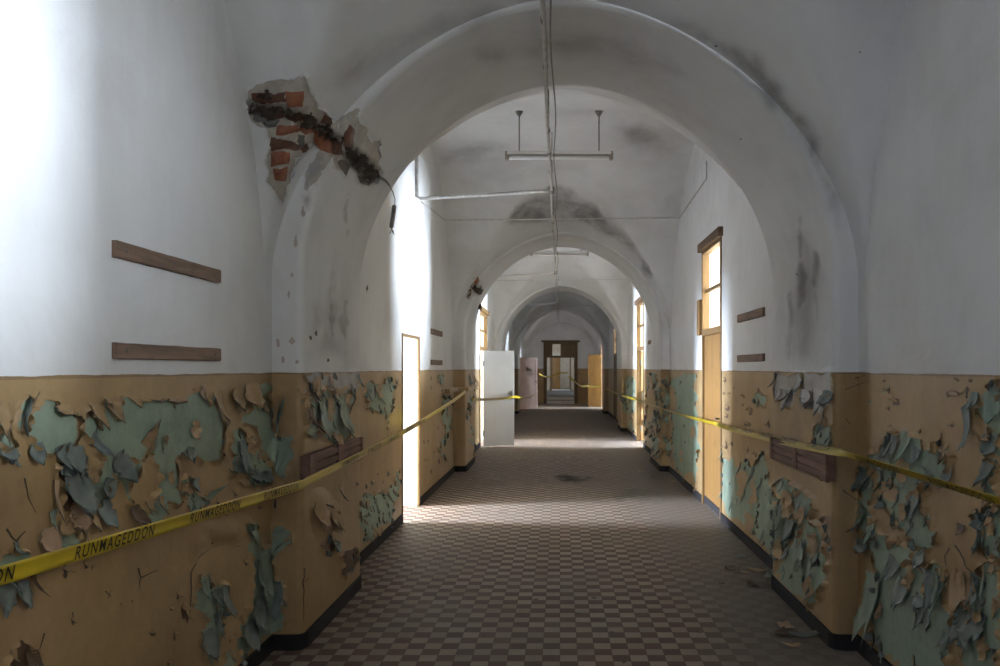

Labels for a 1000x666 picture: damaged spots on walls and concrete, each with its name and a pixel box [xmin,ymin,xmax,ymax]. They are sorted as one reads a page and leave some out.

spalling [242,71,383,210]
spalling [464,273,485,302]
peeling [0,575,49,619]
peeling [0,337,399,566]
peeling [169,499,296,666]
peeling [314,468,403,582]
peeling [619,369,702,492]
peeling [717,441,834,613]
peeling [722,366,840,448]
peeling [850,374,1000,666]